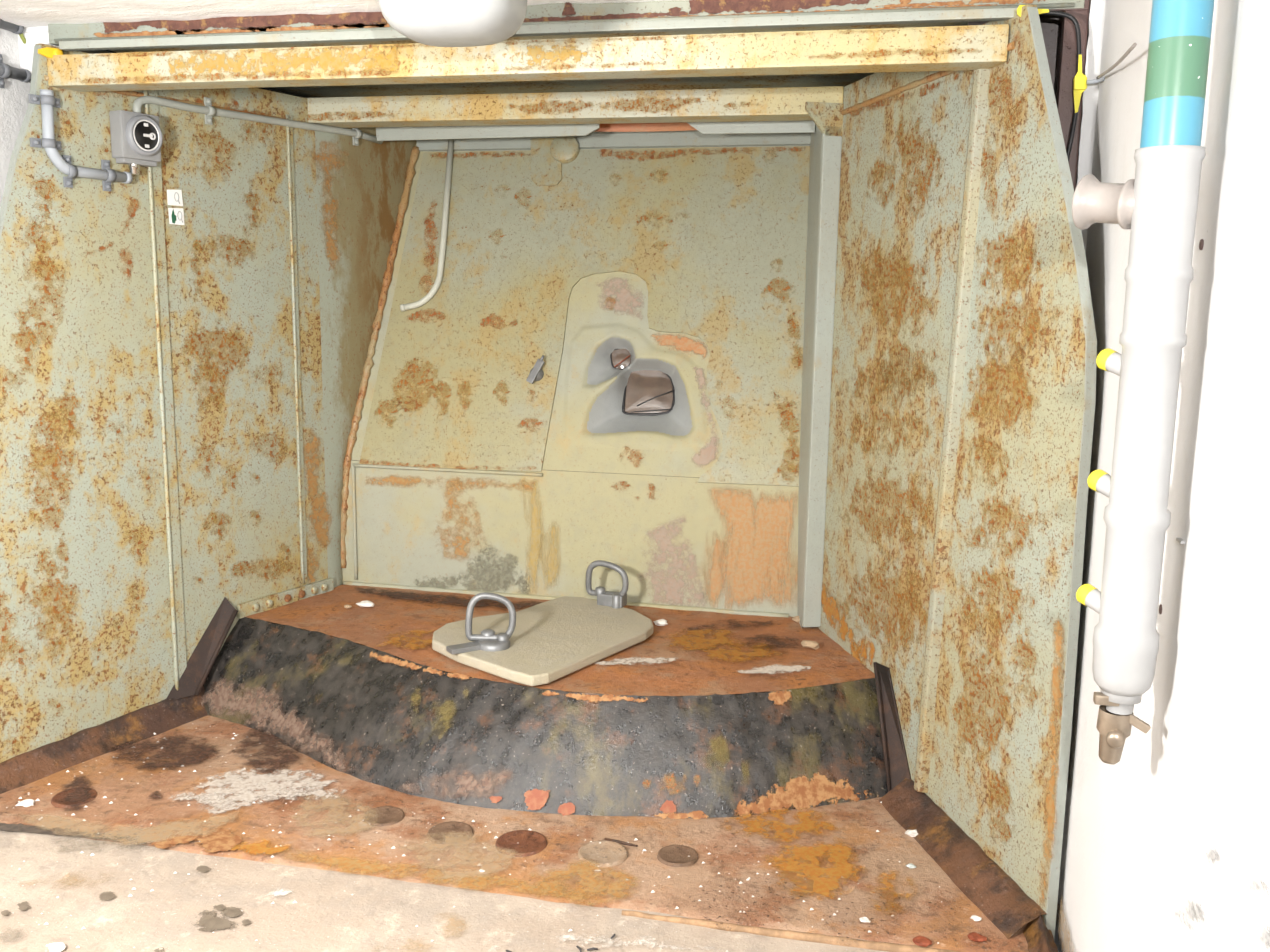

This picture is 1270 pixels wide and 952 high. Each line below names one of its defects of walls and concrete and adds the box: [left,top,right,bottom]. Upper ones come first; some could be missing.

rust [94,23,390,37]
rust [81,44,428,97]
rust [821,242,943,665]
rust [357,587,542,609]
rust [953,500,1046,842]
rust [201,679,345,773]
leakage [439,701,454,729]
rust [25,776,636,905]
rust [690,771,913,945]
leakage [1,901,30,915]
leakage [99,891,116,901]
leakage [194,904,251,931]